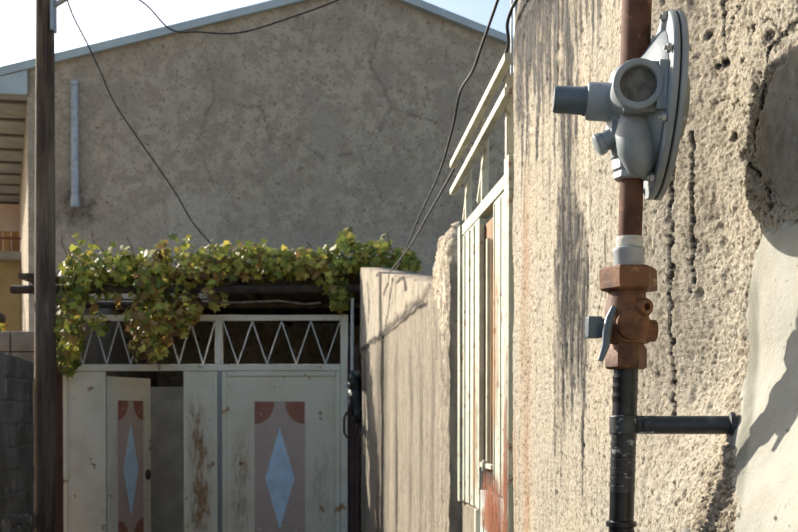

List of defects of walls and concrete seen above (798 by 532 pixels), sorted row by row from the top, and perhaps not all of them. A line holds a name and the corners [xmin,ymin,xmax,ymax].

crack [711,0,745,69]
crack [738,17,798,217]
flaking render [432,221,460,365]
damp [513,0,600,469]
rust [193,432,209,527]
rust [482,397,508,532]